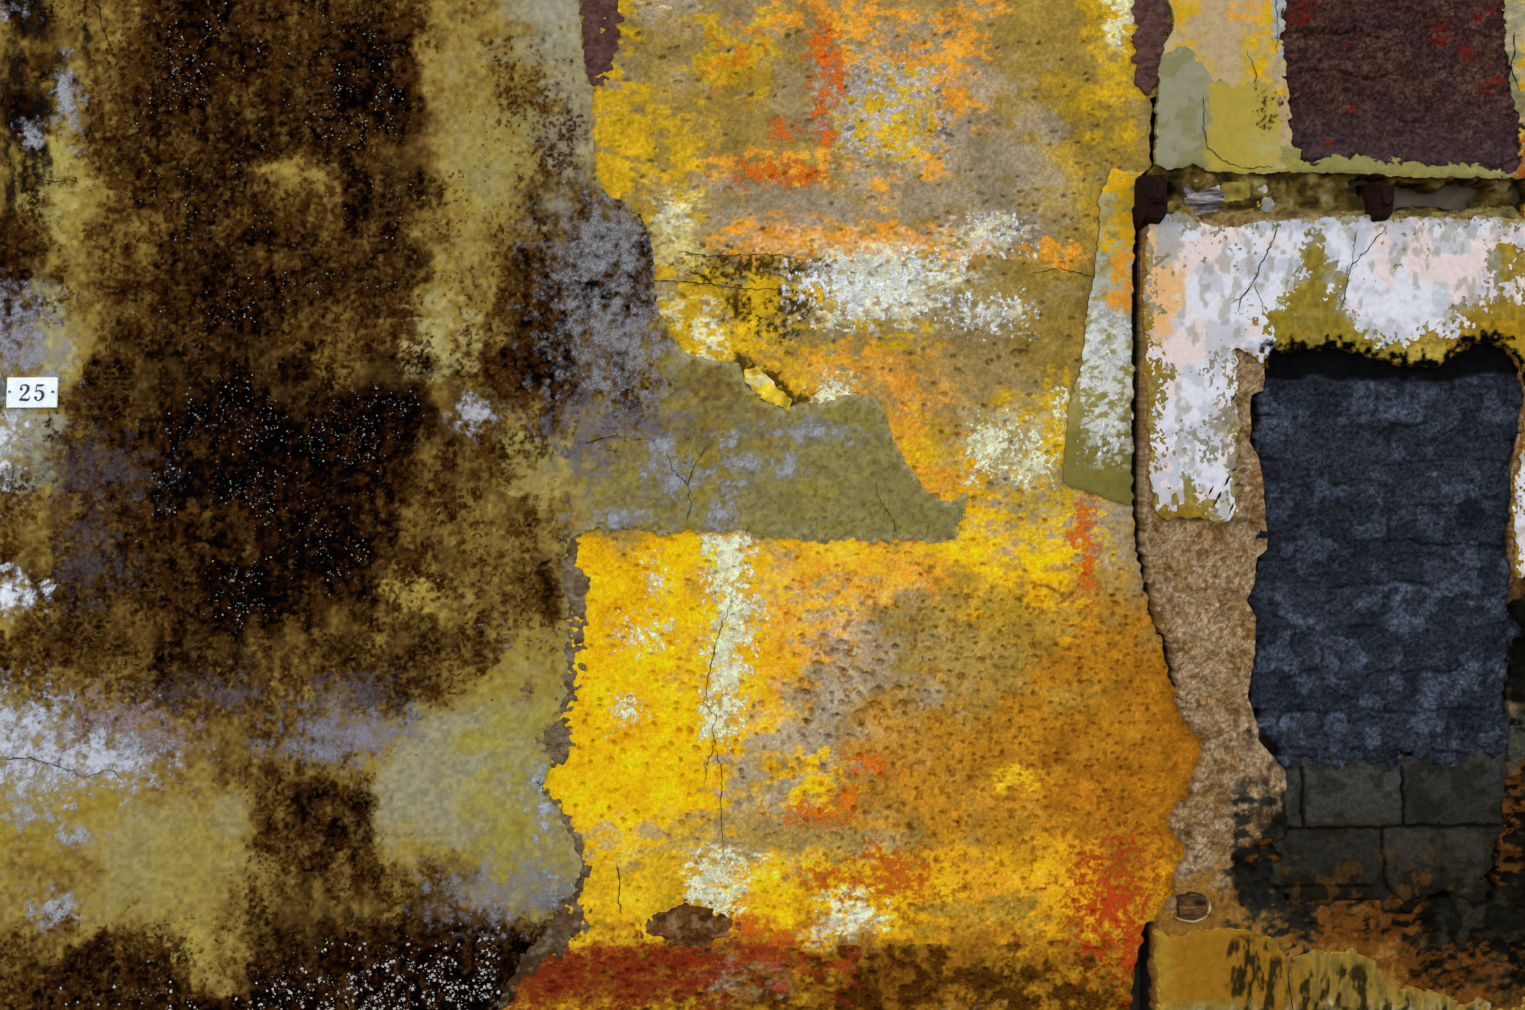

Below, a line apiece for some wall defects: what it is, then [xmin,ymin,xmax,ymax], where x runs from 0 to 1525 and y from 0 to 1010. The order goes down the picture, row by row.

crack [1230,223,1279,311]
leakage [0,0,1135,1010]
flaking render [488,0,1525,1010]
crack [702,609,728,860]
corrosion [1044,819,1172,1008]